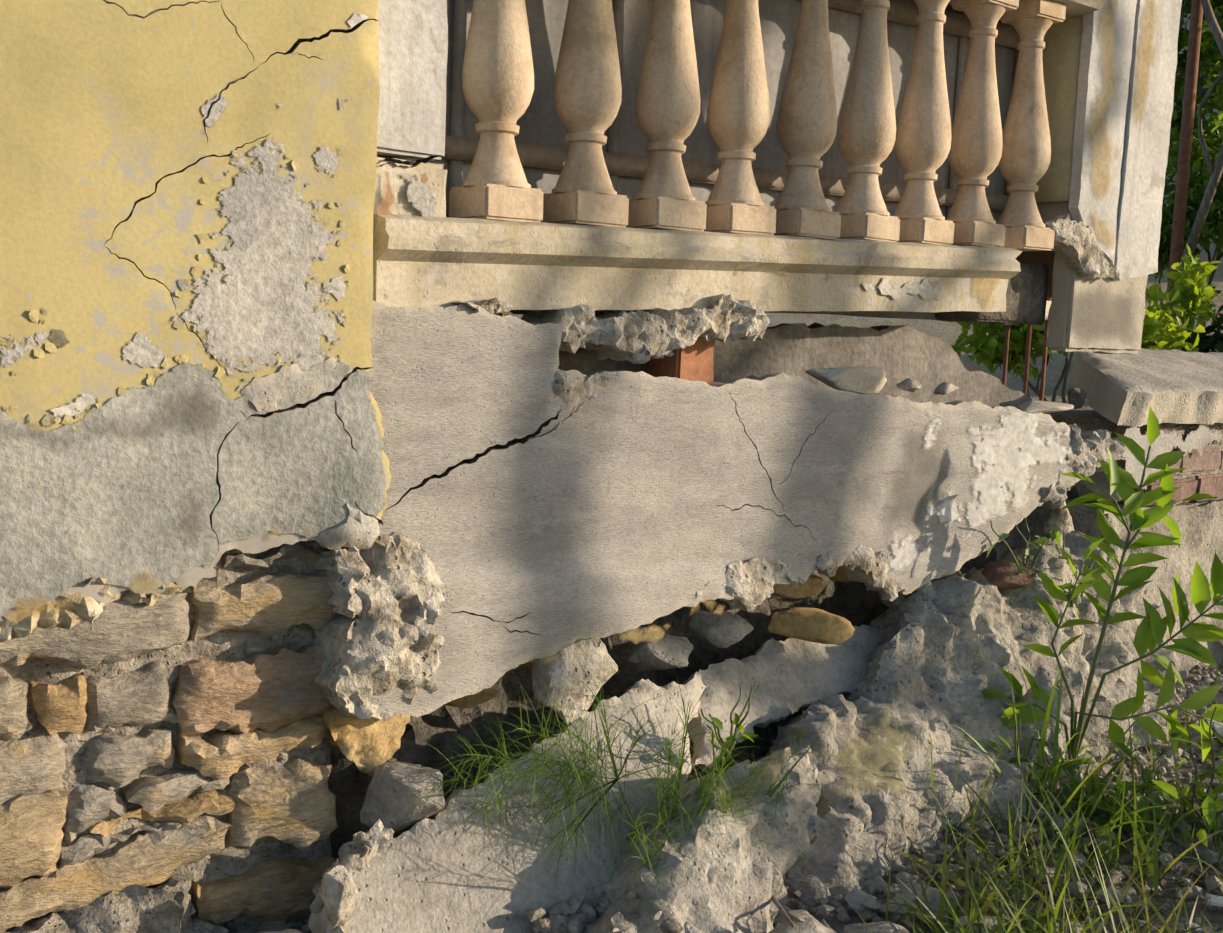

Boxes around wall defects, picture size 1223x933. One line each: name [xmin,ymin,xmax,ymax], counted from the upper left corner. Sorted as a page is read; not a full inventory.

crack [103,0,378,367]
flaking render [0,138,447,721]
crack [210,367,374,550]
crack [362,398,591,525]
crack [717,394,832,535]
spalling [1037,424,1222,510]
spalling [309,818,394,914]